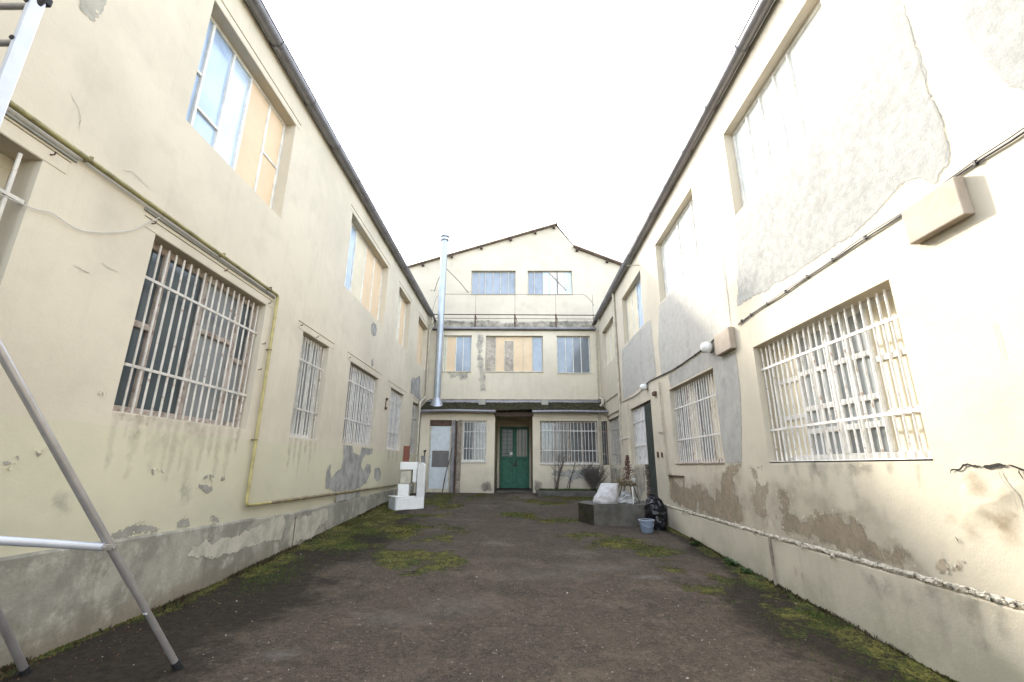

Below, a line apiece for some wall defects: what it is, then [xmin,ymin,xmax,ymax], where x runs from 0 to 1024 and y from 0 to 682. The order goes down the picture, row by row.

peeling [79,0,106,22]
peeling [187,444,381,559]
crack [950,463,1024,510]
peeling [111,520,159,540]
peeling [665,463,1024,610]